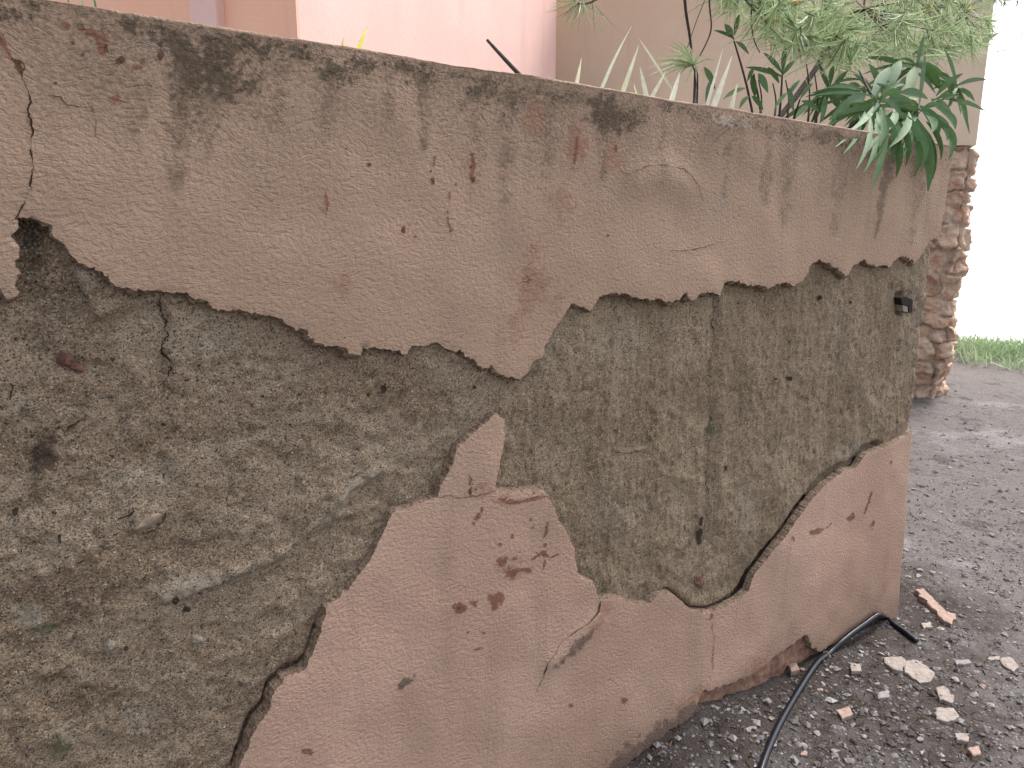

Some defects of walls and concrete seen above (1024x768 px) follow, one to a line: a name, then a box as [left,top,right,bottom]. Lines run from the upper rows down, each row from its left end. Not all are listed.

water stain [119,16,648,136]
crack [15,73,96,219]
crack [158,297,179,394]
spalling [0,146,980,768]
corrosion [497,493,548,504]
corrosion [497,518,560,580]
corrosion [452,592,505,614]
crack [537,602,601,690]